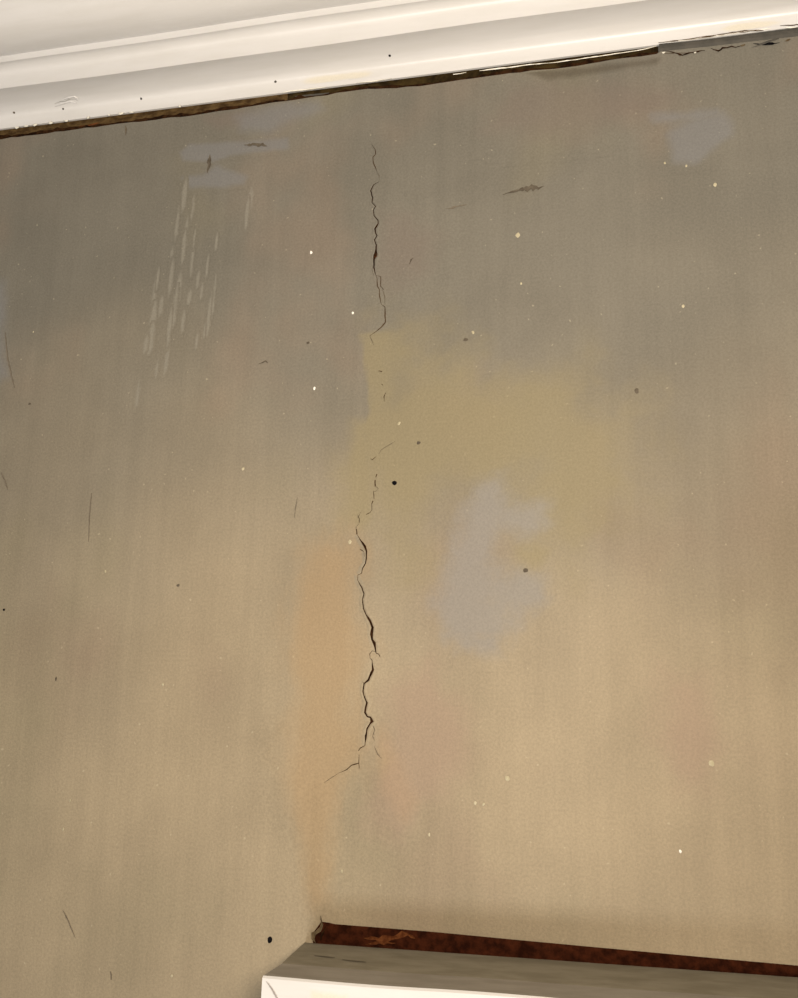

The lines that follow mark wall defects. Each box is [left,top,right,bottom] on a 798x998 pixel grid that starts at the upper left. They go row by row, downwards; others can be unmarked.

crack [367,145,386,340]
crack [327,442,394,781]